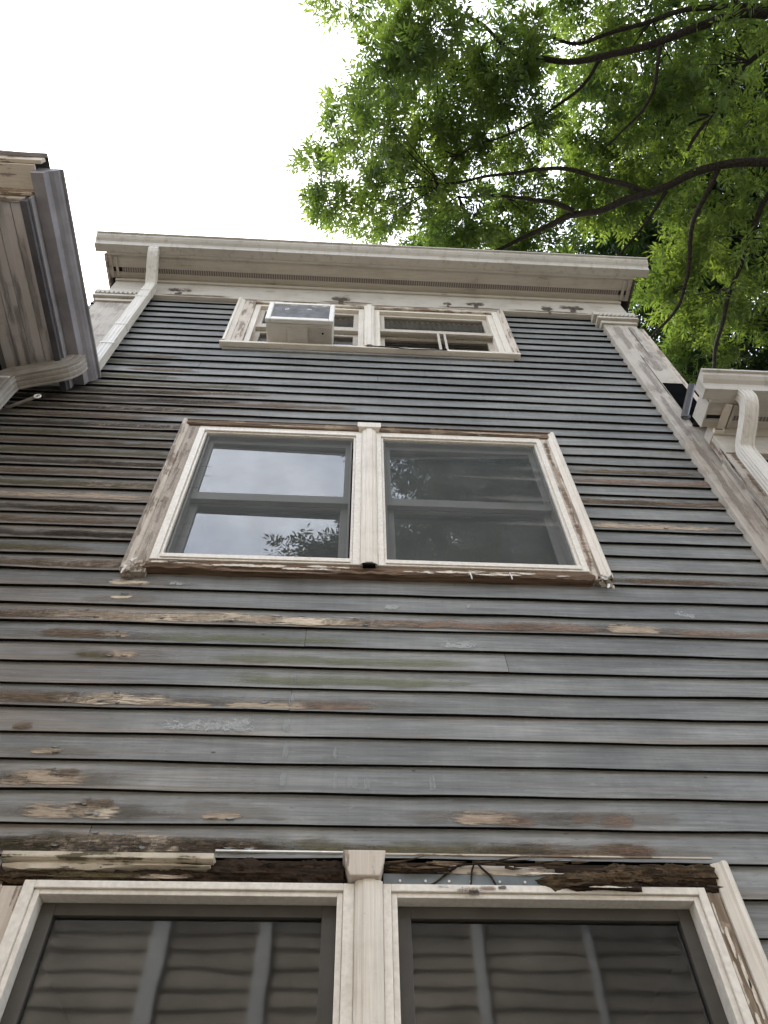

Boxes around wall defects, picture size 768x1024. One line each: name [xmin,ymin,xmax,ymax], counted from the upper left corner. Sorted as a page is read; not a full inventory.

peeling [123,421,352,574]
peeling [0,578,768,659]
peeling [0,691,395,732]
peeling [0,768,275,853]
water stain [0,836,651,859]
peeling [711,903,765,1024]